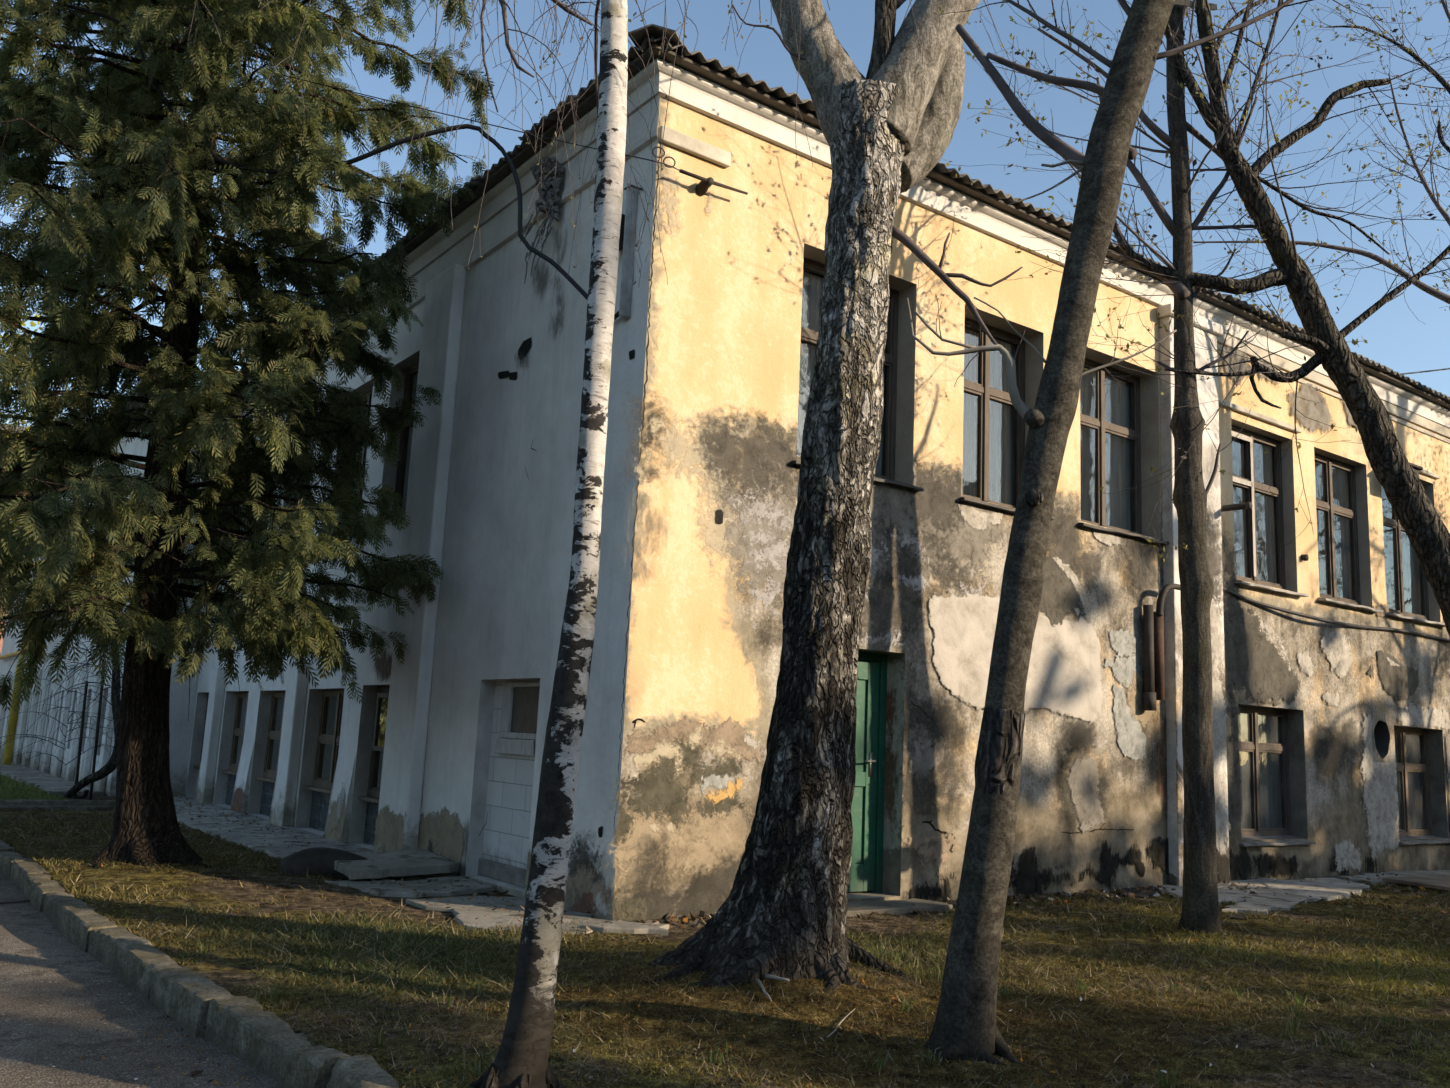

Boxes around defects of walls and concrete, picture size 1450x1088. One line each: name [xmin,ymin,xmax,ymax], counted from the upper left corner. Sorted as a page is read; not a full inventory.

damp [693,412,799,617]
spalling [958,504,1003,531]
flaking render [1040,556,1091,627]
peeling [1102,629,1147,762]
flaking render [1210,598,1314,854]
flaking render [1367,649,1419,702]
damp [568,835,602,881]
damp [613,735,747,919]